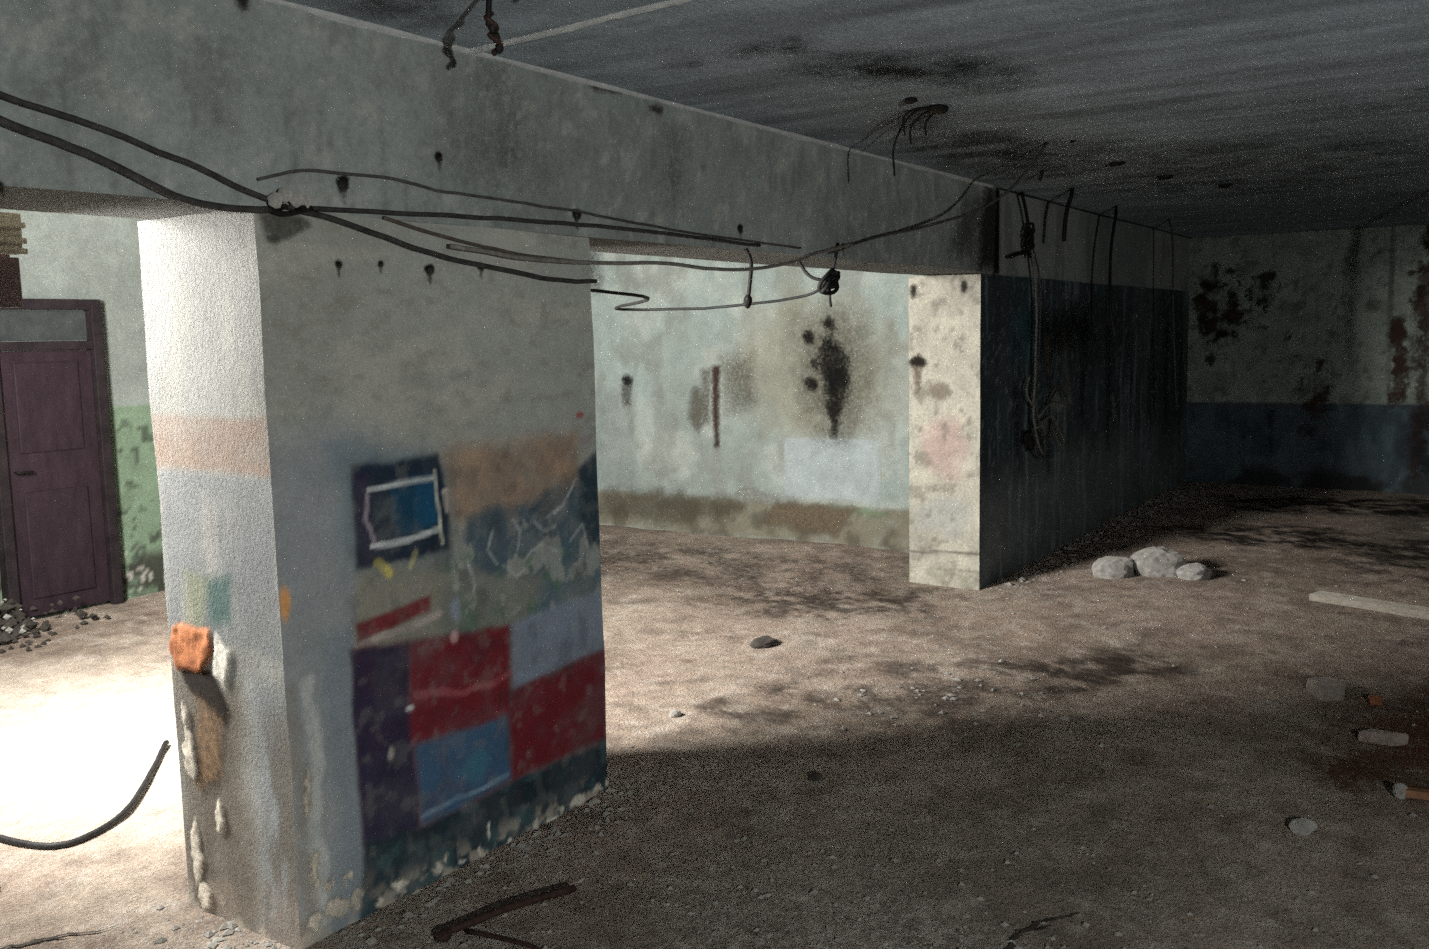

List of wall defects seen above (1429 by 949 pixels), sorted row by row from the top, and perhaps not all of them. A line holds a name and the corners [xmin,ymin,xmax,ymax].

leakage [826,402,839,435]